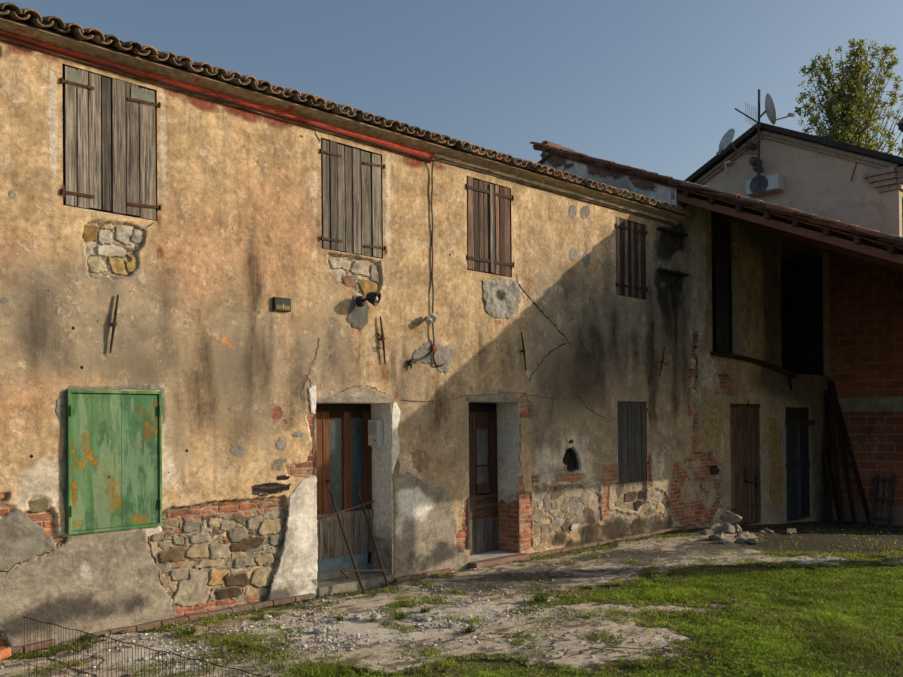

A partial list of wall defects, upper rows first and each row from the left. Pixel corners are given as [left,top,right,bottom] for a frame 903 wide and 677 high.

crack [516,275,574,384]
crack [300,337,320,397]
flaking render [272,406,288,427]
flaking render [664,331,735,528]
spalling [555,439,585,483]
flaking render [0,493,14,517]
flaking render [25,510,66,548]
flaking render [147,415,315,617]
flaking render [456,497,468,549]
flaking render [496,475,539,553]
flaking render [601,465,617,522]